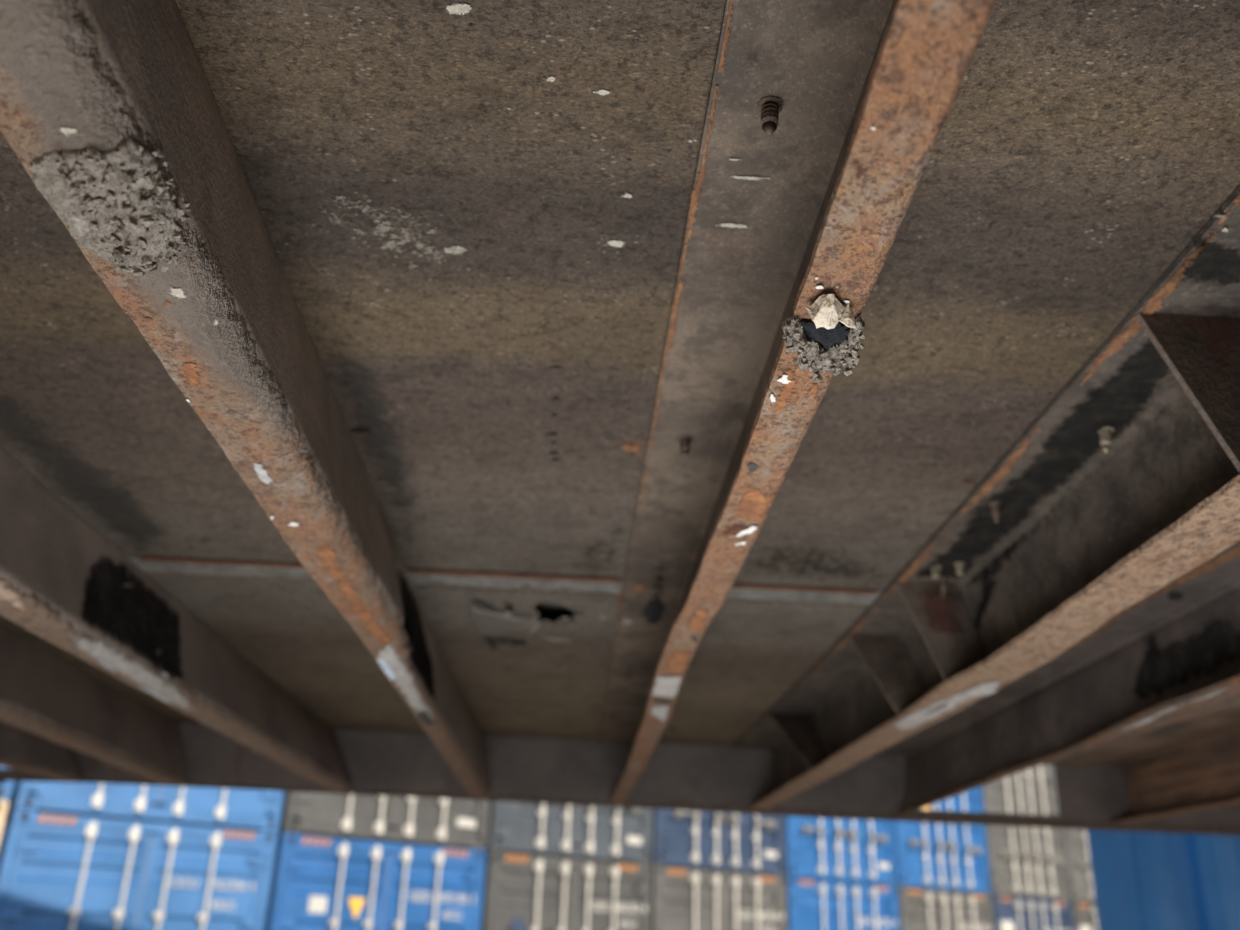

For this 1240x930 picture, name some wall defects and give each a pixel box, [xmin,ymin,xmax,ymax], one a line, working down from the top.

rust [609,0,733,504]
rust [1058,196,1240,407]
rust [772,370,823,415]
peeling [471,606,574,650]
rust [721,487,775,537]
rust [732,418,1048,672]
rust [1064,544,1240,652]